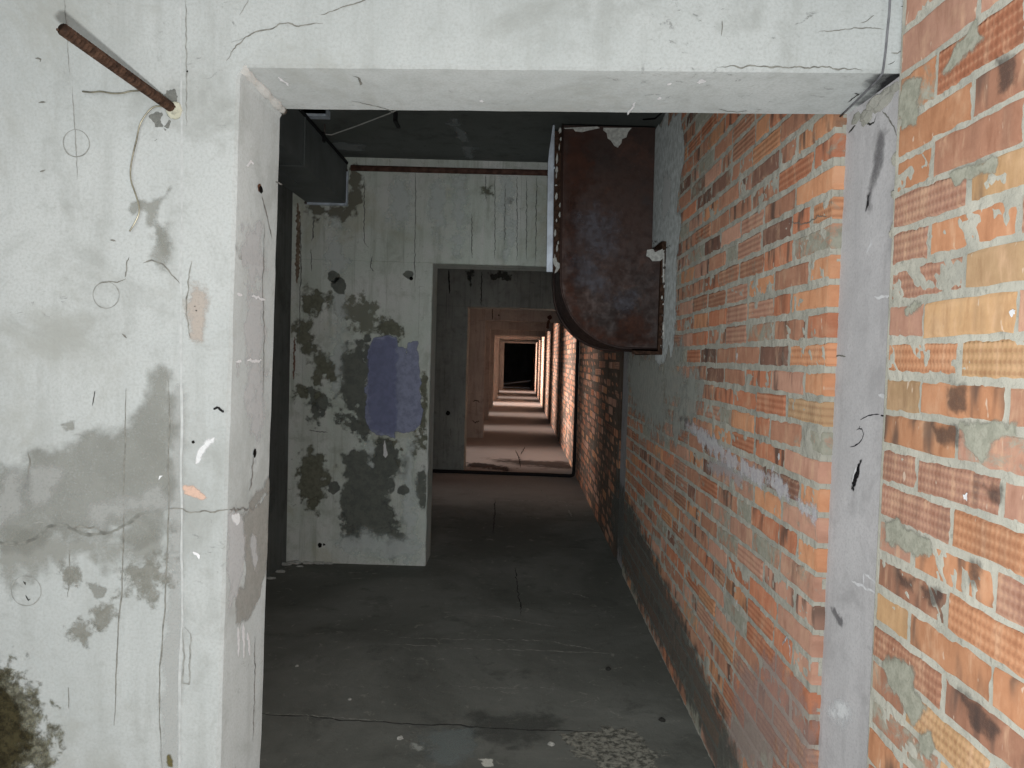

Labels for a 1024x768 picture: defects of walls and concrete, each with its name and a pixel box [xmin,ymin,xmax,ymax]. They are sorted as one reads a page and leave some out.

crack [226,0,365,61]
crack [726,64,897,136]
damp [130,200,168,261]
damp [291,289,428,564]
damp [0,368,173,585]
crack [0,507,248,546]
damp [0,656,63,768]
crack [253,645,594,735]
spalling [560,726,668,768]